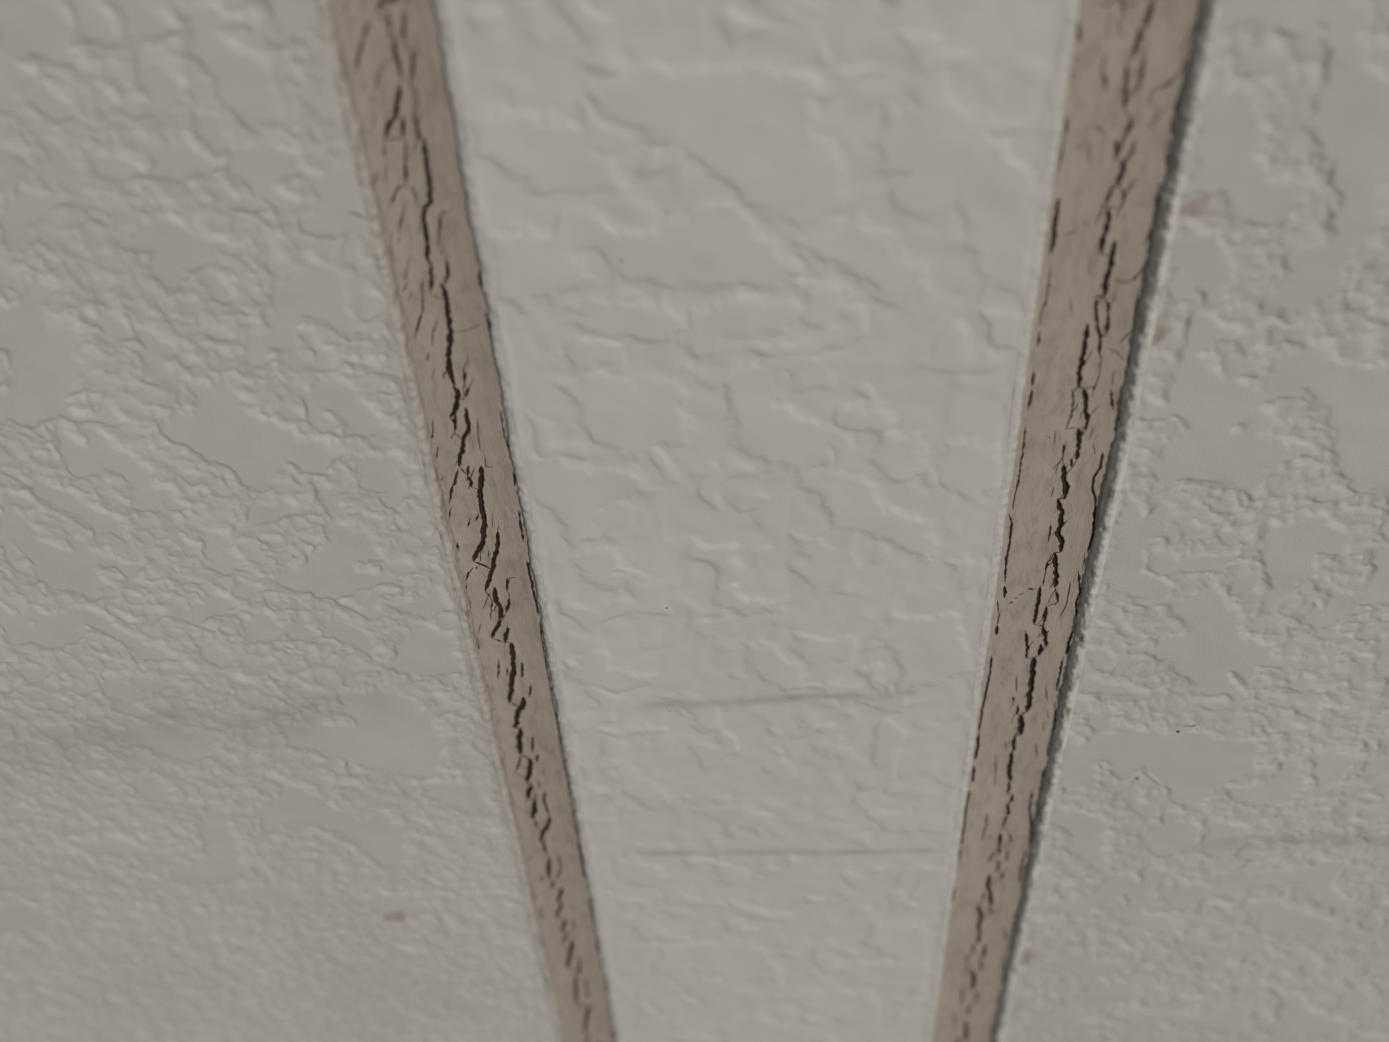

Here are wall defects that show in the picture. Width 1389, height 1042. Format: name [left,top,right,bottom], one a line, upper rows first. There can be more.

crack [346,0,613,1042]
crack [952,0,1194,1042]